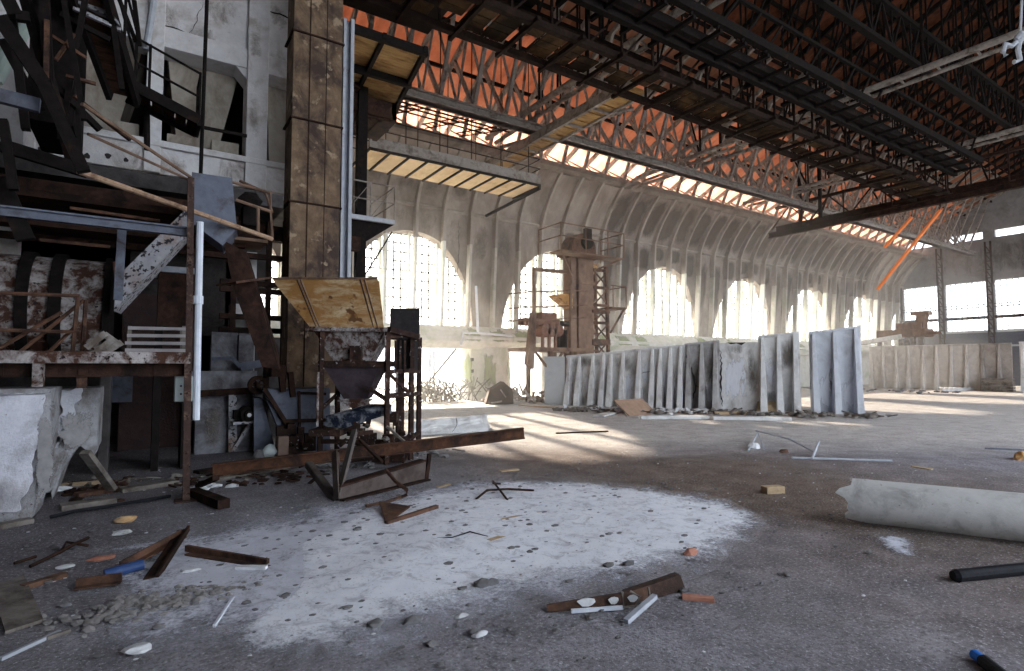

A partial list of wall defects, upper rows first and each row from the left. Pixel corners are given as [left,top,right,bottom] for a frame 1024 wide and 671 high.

peeling [0,388,92,512]